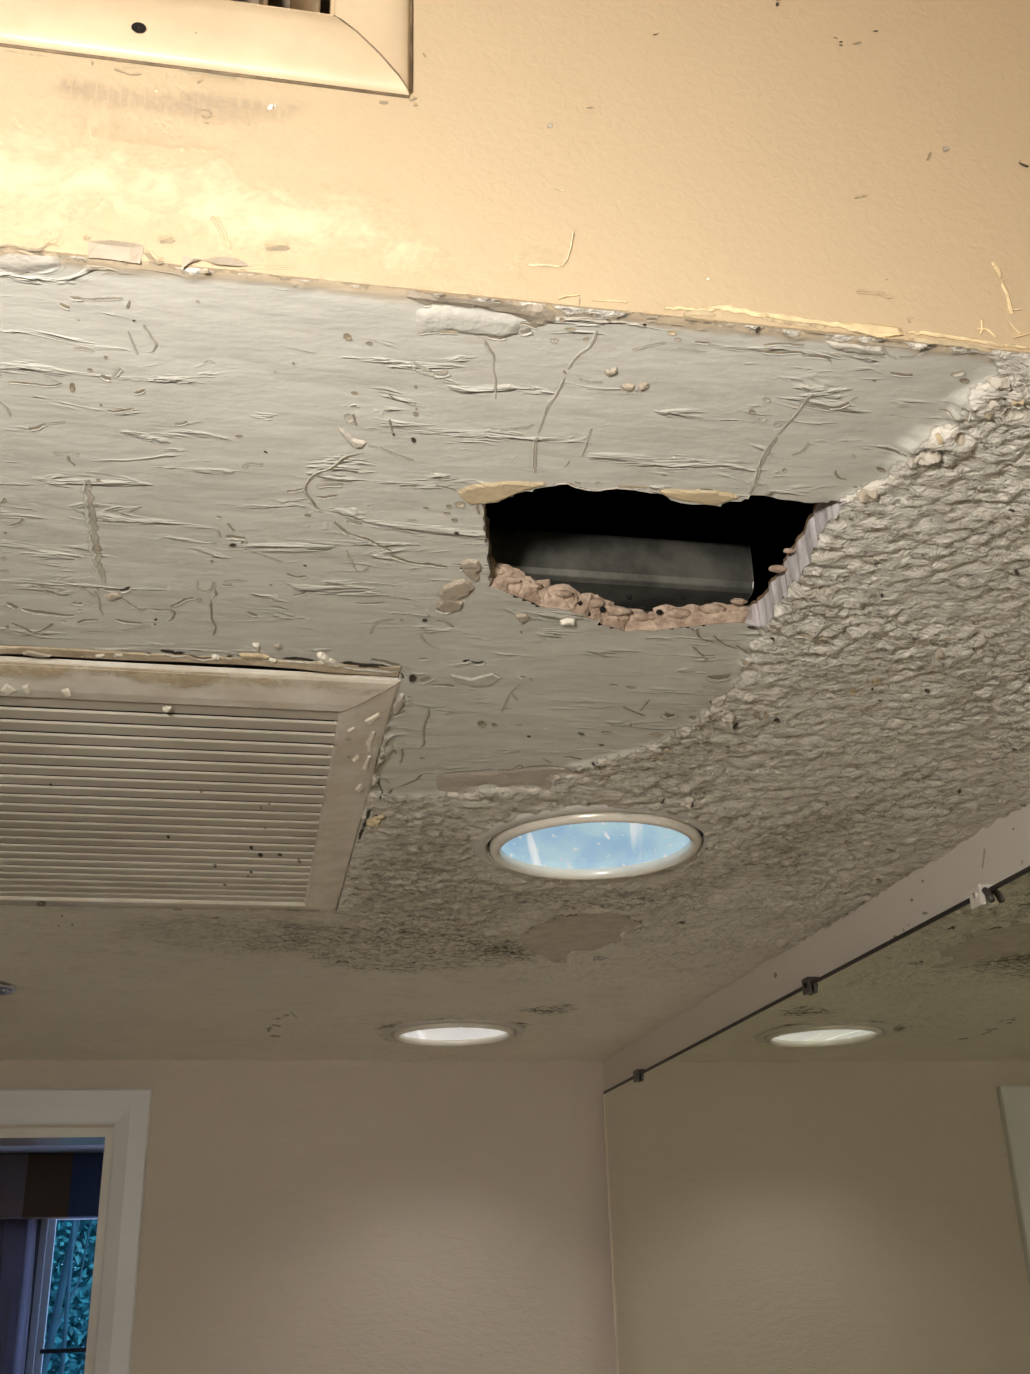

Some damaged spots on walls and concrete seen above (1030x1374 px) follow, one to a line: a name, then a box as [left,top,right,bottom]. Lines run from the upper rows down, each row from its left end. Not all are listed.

crack [59,296,158,354]
crack [706,322,925,363]
crack [480,331,597,473]
crack [749,394,813,494]
crack [833,409,972,488]
crack [0,375,454,673]
peeling [0,216,1025,840]
crack [691,626,757,667]
peeling [519,913,648,964]